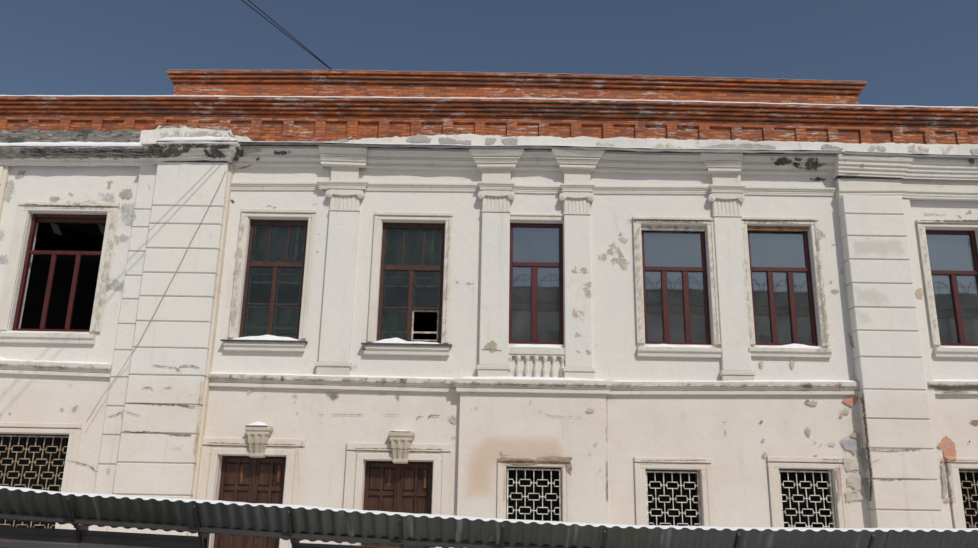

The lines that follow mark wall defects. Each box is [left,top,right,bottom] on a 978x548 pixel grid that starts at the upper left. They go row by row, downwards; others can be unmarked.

spalling [699,143,843,181]
peeling [50,181,135,331]
peeling [571,266,592,297]
peeling [598,227,644,327]
crack [108,365,295,445]
peeling [806,428,870,501]
crack [860,394,920,500]
spalling [938,436,957,503]